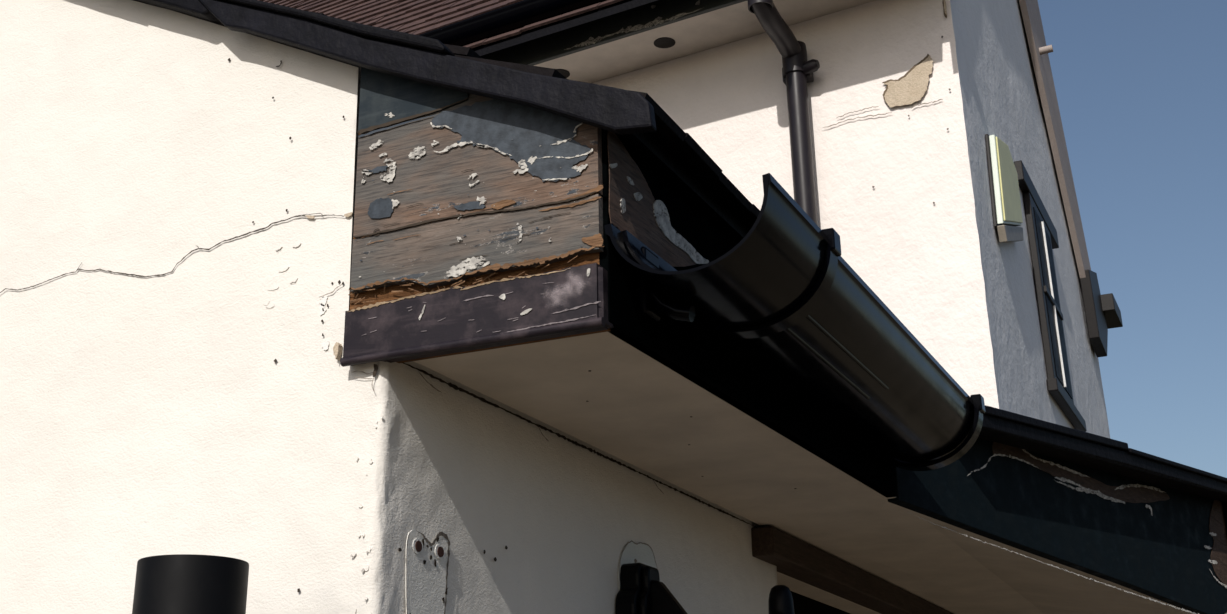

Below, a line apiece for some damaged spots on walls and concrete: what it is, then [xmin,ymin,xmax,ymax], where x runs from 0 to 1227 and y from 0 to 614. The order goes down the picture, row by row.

spalling [882,54,933,117]
peeling [355,97,709,267]
crack [0,212,353,293]
peeling [446,255,490,278]
peeling [319,280,344,360]
peeling [967,442,1170,515]
peeling [918,517,1199,614]
peeling [1204,500,1227,588]